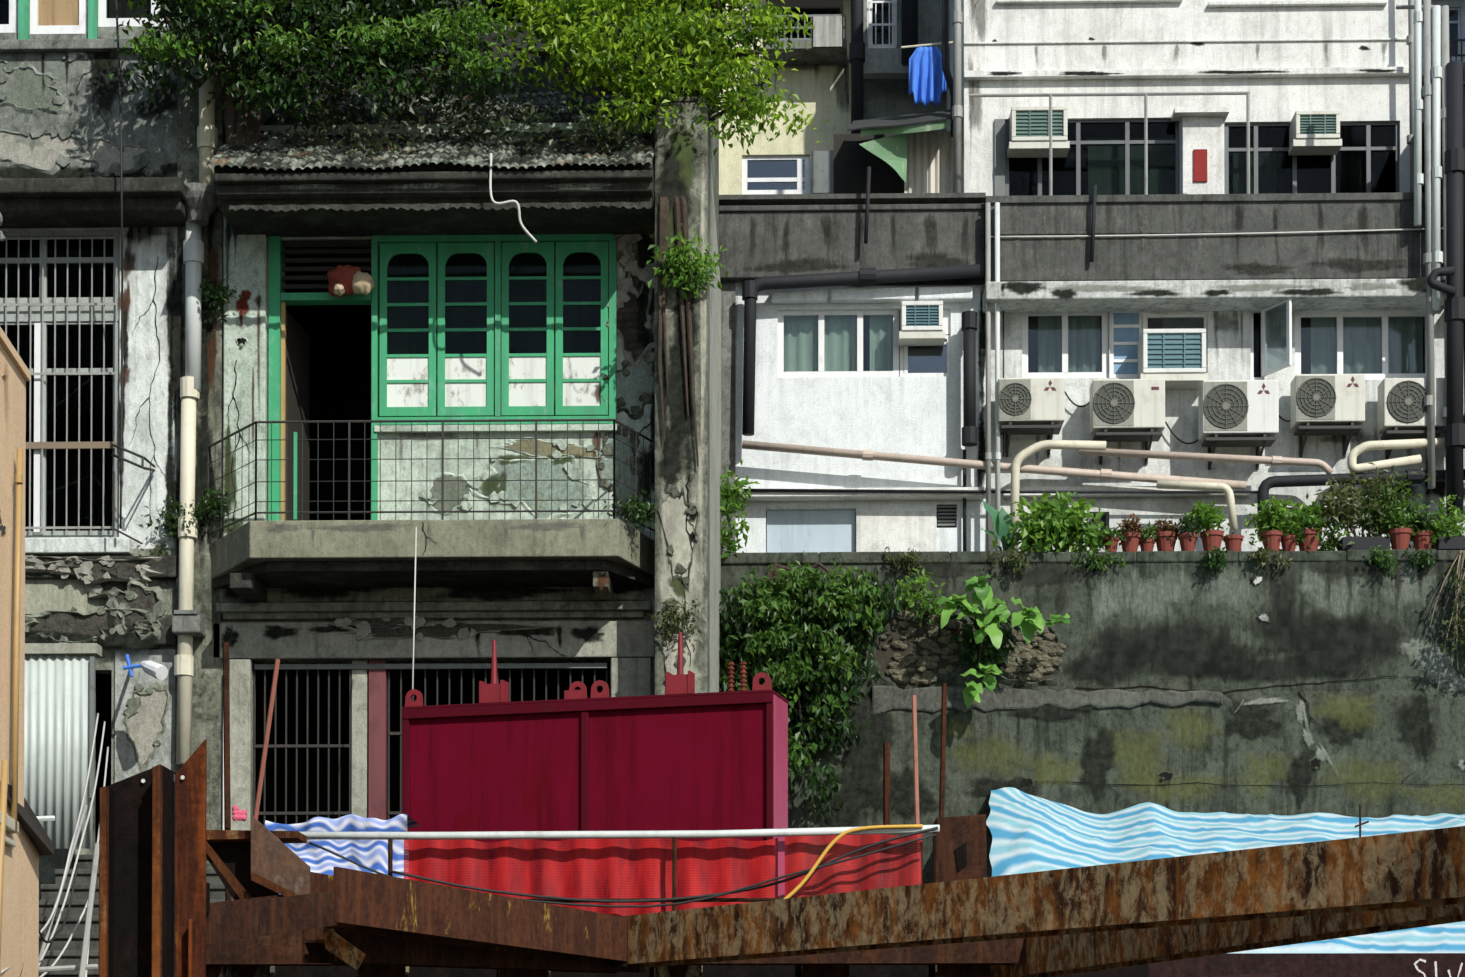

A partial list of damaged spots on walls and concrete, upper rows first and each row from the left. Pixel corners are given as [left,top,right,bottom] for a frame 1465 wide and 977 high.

flaking render [0,52,154,177]
flaking render [420,234,655,519]
leakage [613,126,706,693]
spalling [25,555,172,643]
leakage [283,588,378,599]
leakage [438,587,566,600]
flaking render [653,484,701,681]
flaking render [122,682,172,773]
leakage [969,559,1465,809]